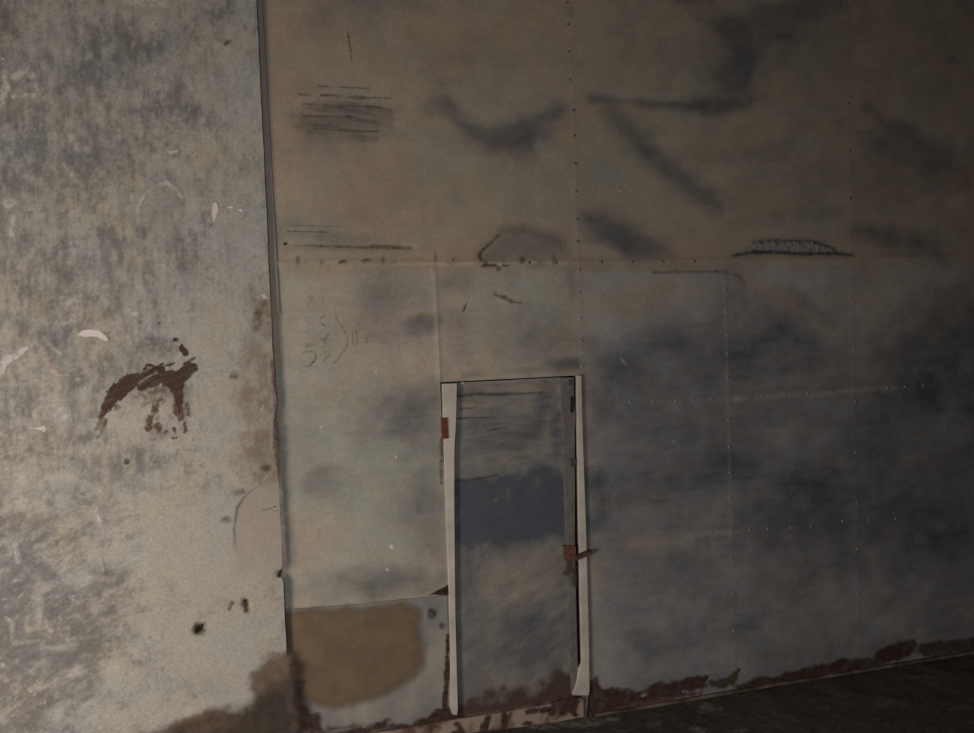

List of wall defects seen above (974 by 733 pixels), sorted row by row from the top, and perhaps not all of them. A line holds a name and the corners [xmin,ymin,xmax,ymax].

corrosion [98,338,198,439]
leakage [162,654,299,733]
corrosion [285,603,465,733]
corrosion [479,712,507,732]